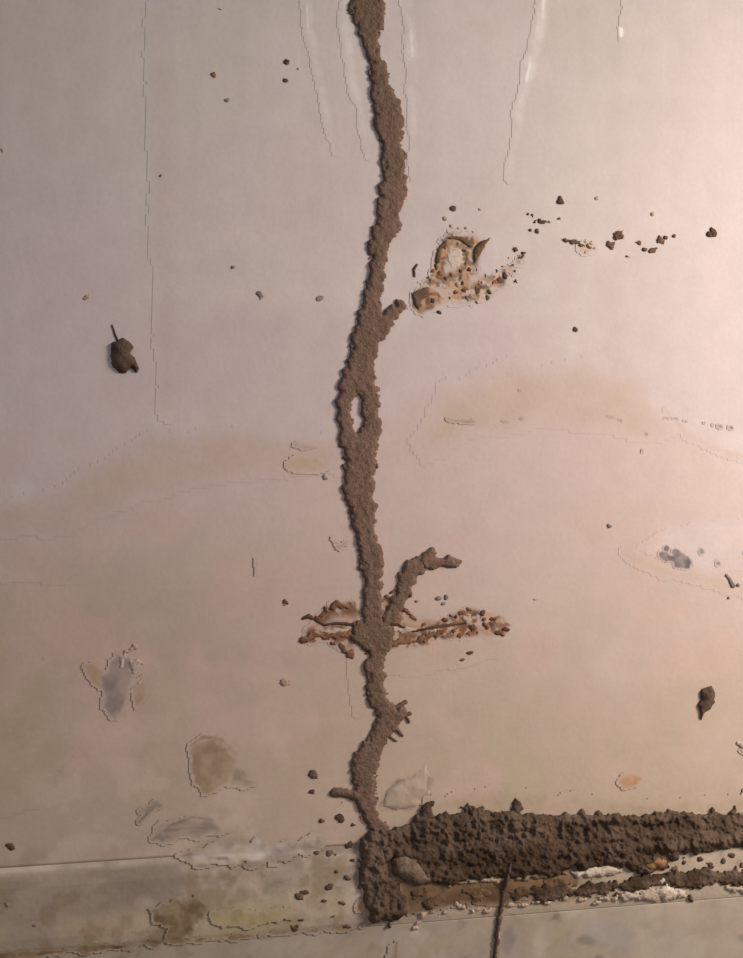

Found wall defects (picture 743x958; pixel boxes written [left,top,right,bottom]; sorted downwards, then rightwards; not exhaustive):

peeling [408,206,527,318]